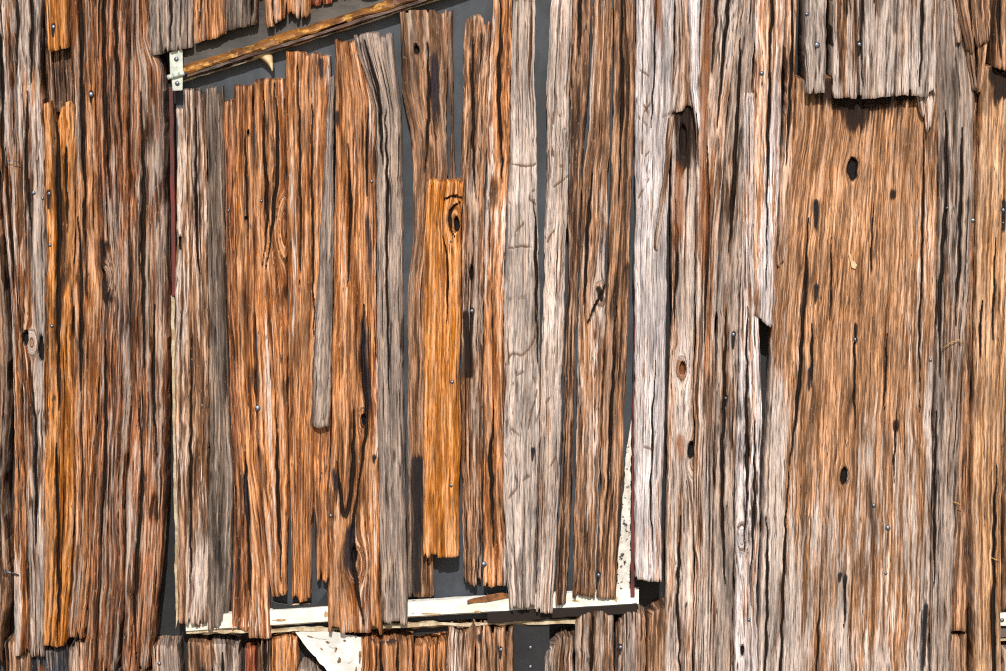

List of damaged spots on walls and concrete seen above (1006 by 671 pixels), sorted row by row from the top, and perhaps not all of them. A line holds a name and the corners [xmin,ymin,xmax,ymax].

crack [337,41,390,625]
crack [443,0,617,547]
crack [618,0,671,207]